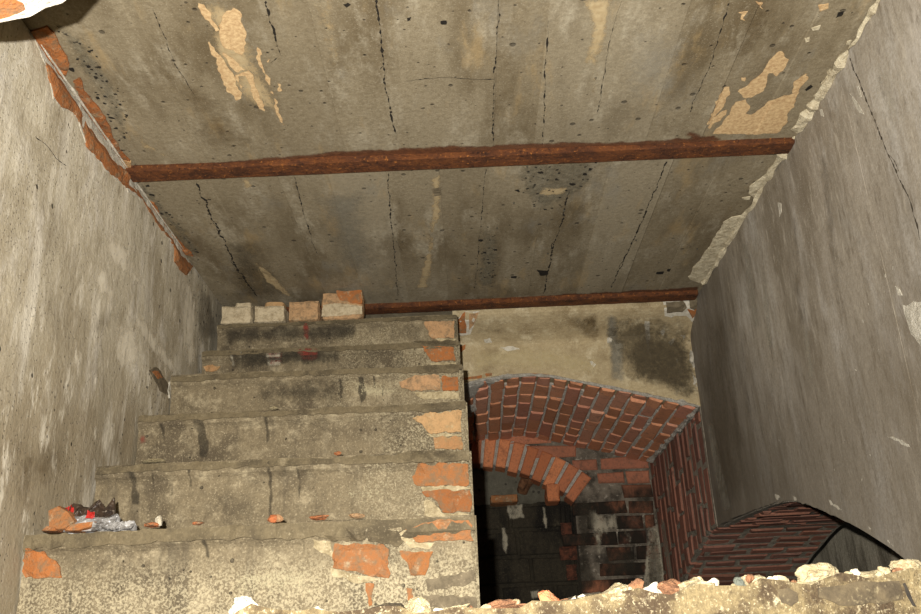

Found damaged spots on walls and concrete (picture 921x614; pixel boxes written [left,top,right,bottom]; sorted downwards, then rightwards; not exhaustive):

spalling [28,25,199,275]
peeling [198,3,284,125]
crack [375,0,396,133]
corrosion [222,132,718,163]
crack [541,33,549,144]
peeling [707,51,809,135]
crack [850,58,920,240]
crack [196,183,257,296]
crack [611,162,667,287]
water stain [616,326,691,392]
flaking render [413,410,463,450]
flaking render [400,462,477,608]